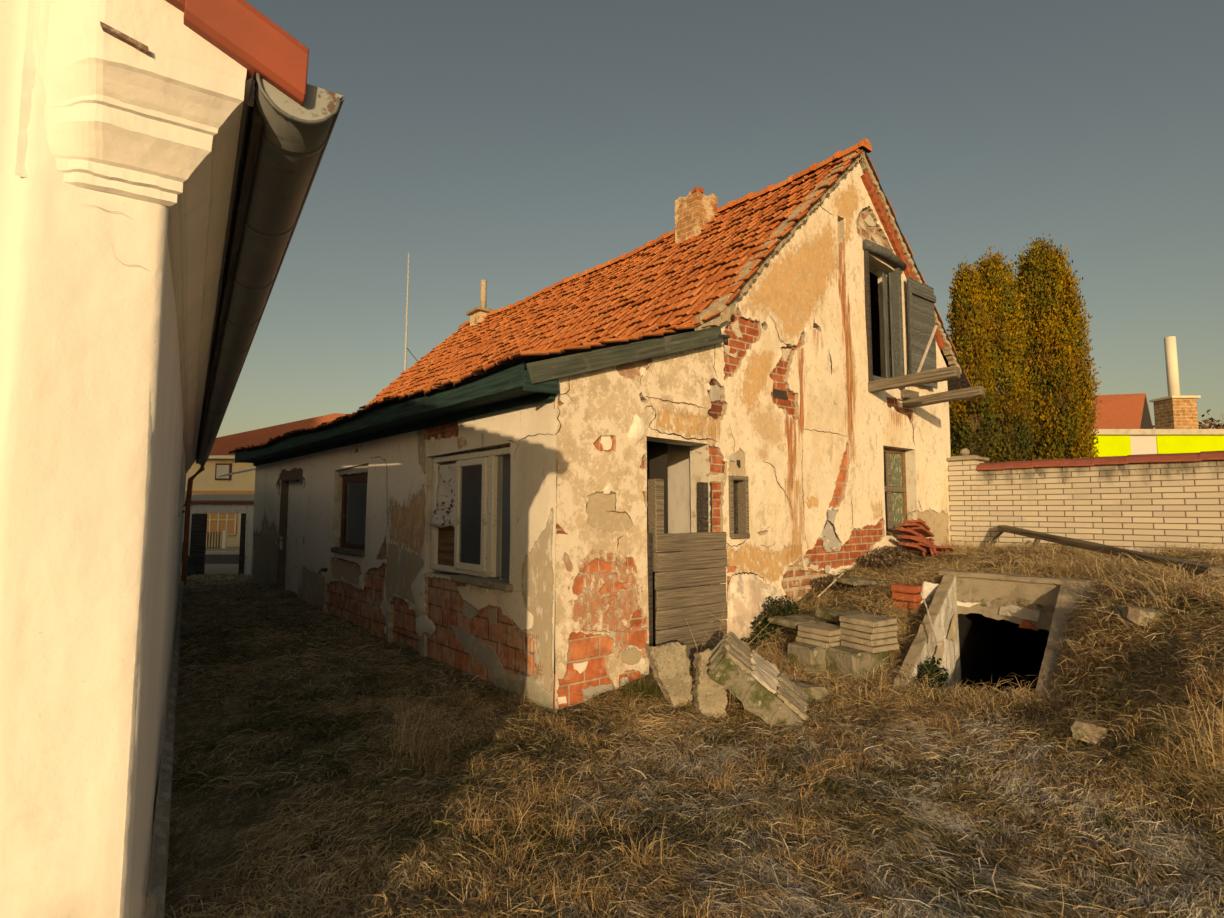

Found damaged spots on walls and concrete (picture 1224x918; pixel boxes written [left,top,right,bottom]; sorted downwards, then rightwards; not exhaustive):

spalling [322,421,647,711]
crack [640,360,735,447]
peeling [656,409,741,532]
crack [726,403,853,585]
spalling [726,445,883,603]
peeling [722,185,896,458]